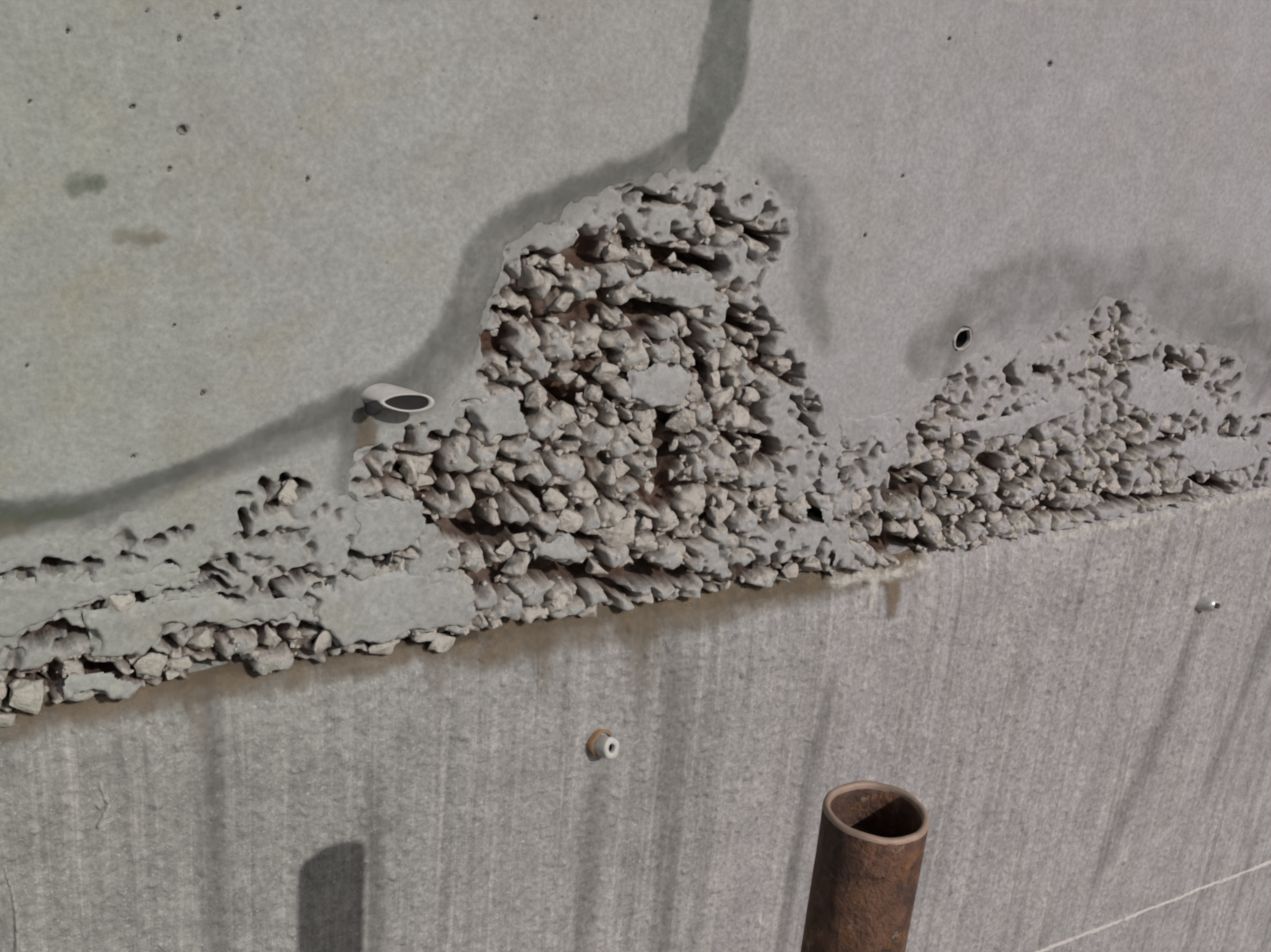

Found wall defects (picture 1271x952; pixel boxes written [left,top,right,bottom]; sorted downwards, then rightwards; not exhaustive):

leakage [677,0,750,172]
flaking render [517,254,575,312]
flaking render [602,244,678,276]
flaking render [524,362,620,445]
flaking render [617,339,760,451]
leakage [0,452,230,530]
flaking render [485,464,515,495]
flaking render [543,487,583,533]
flaking render [706,481,735,528]
flaking render [495,532,538,578]
flaking render [134,622,217,680]
flaking render [0,679,44,727]